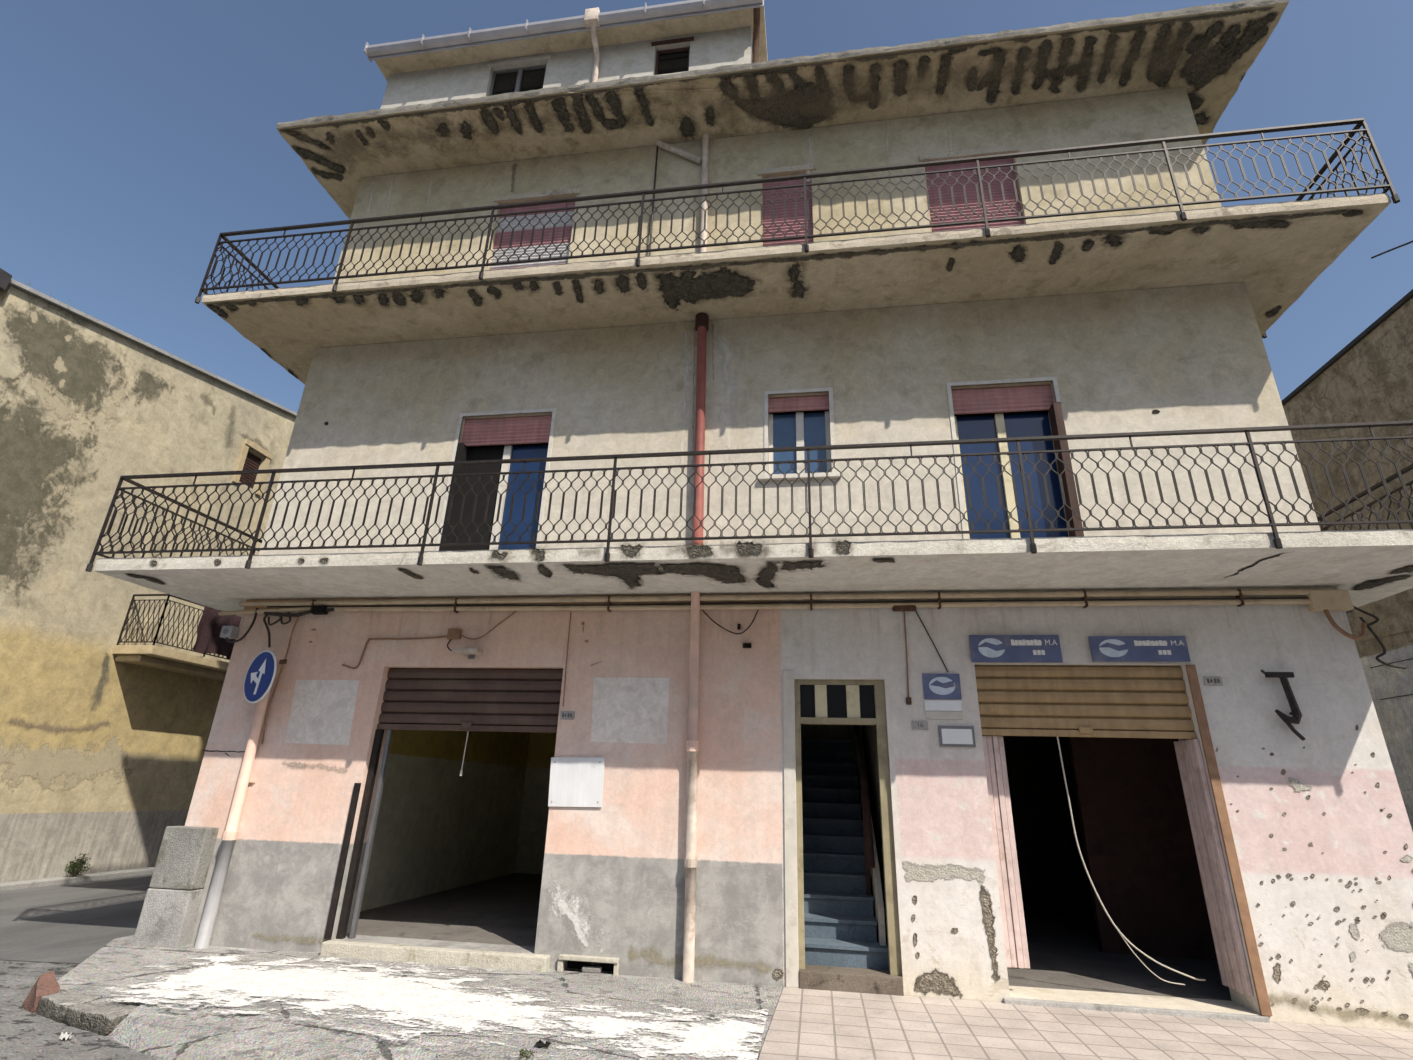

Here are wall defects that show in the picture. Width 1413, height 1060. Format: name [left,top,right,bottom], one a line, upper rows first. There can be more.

spalling [280,7,1278,181]
peeling [207,210,1363,319]
damp [0,301,174,596]
spalling [469,550,521,581]
spalling [531,540,853,589]
peeling [1262,748,1312,799]
damp [548,881,604,953]
peeling [903,861,1001,999]
flaking render [1259,873,1409,1020]